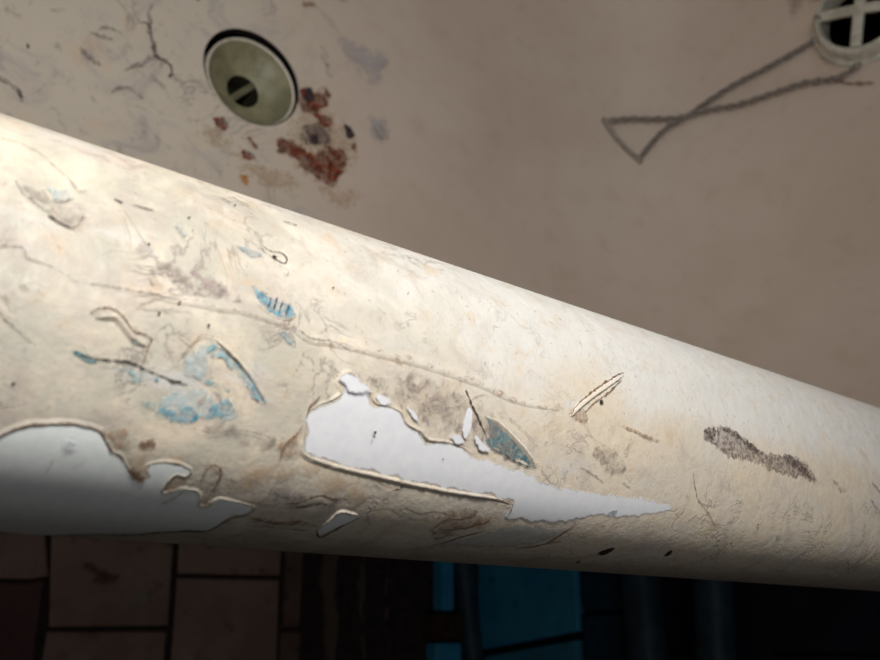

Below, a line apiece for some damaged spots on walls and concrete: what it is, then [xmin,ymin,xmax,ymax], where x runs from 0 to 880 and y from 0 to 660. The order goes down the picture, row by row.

crack [116,16,174,99]
rust [276,87,356,186]
peeling [0,418,256,535]
peeling [298,369,672,522]